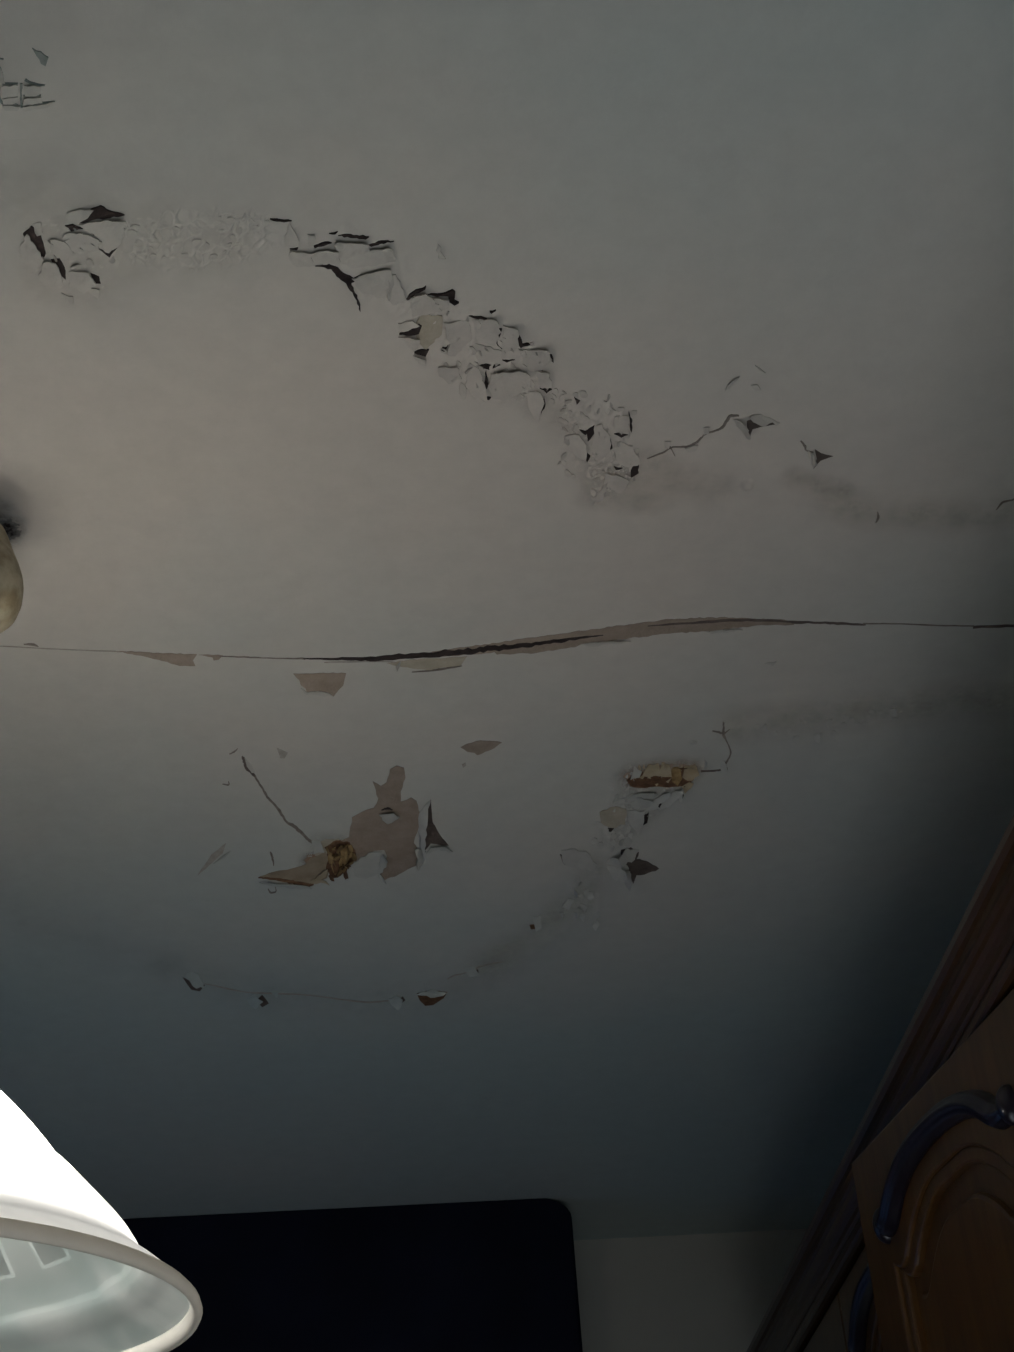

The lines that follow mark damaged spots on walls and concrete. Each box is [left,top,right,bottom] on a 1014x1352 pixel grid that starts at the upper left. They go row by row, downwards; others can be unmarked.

peeling [1,84,53,112]
peeling [16,201,137,304]
peeling [270,218,646,508]
crack [647,414,739,459]
peeling [800,441,833,469]
peeling [293,673,346,697]
crack [0,617,1014,673]
crack [222,748,312,844]
peeling [258,766,453,894]
peeling [591,761,701,891]